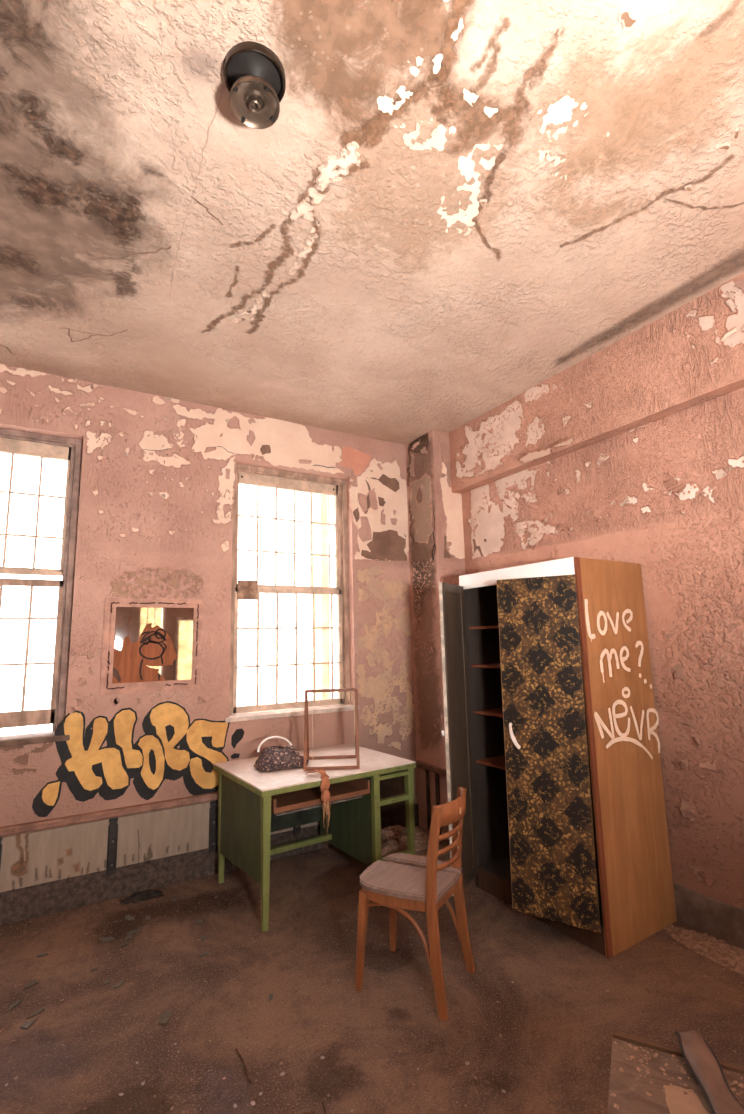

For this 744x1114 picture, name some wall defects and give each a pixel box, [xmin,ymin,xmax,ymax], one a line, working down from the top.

damp [0,0,150,311]
damp [202,167,328,334]
spalling [279,141,361,280]
spalling [377,54,456,153]
damp [274,0,564,259]
spalling [437,141,503,236]
spalling [463,89,498,118]
spalling [534,90,589,180]
damp [560,155,743,247]
peeling [669,279,744,366]
peeling [0,364,611,563]
damp [409,433,428,453]